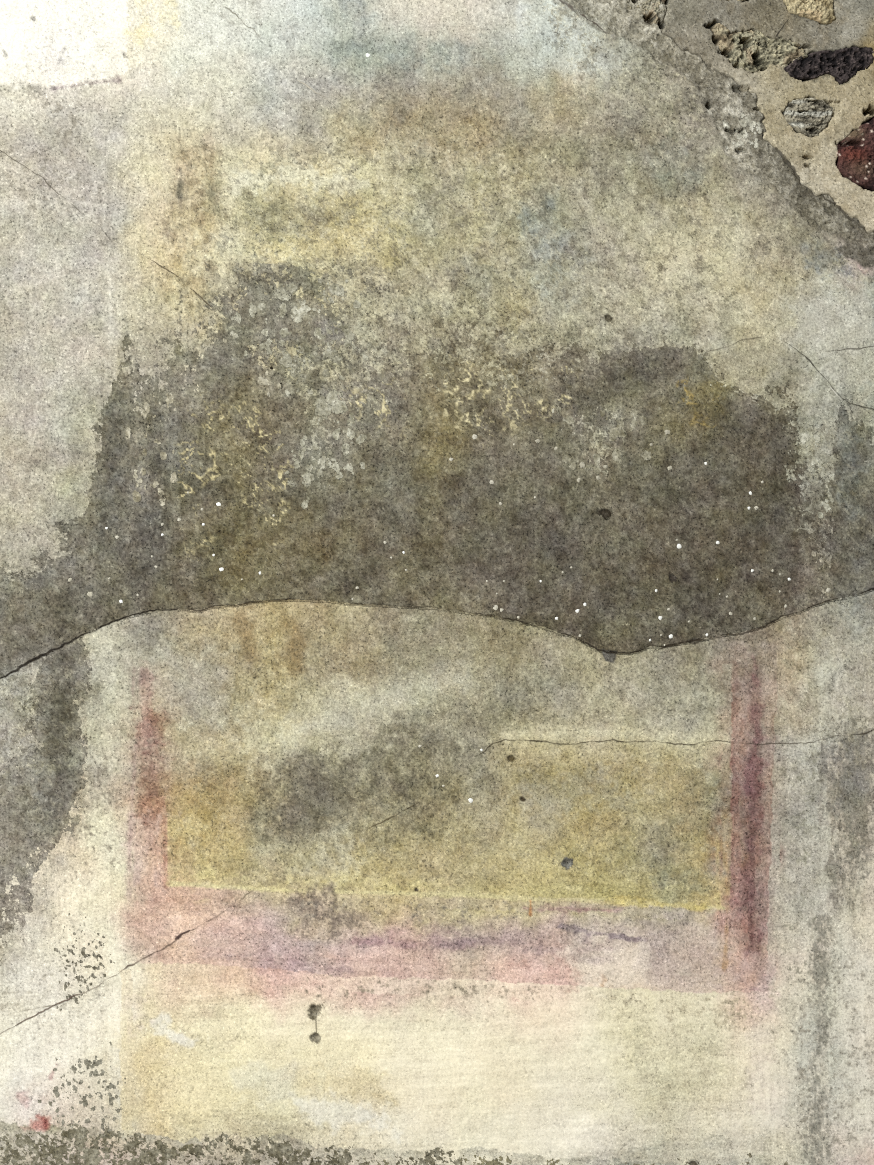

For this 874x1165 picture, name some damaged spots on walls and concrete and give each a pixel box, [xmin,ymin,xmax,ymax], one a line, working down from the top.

flaking render [553,0,874,267]
crack [790,345,874,410]
crack [0,598,298,678]
leakage [0,223,874,949]
crack [453,588,874,654]
crack [474,739,730,757]
leakage [54,913,115,1011]
crack [0,919,211,1034]